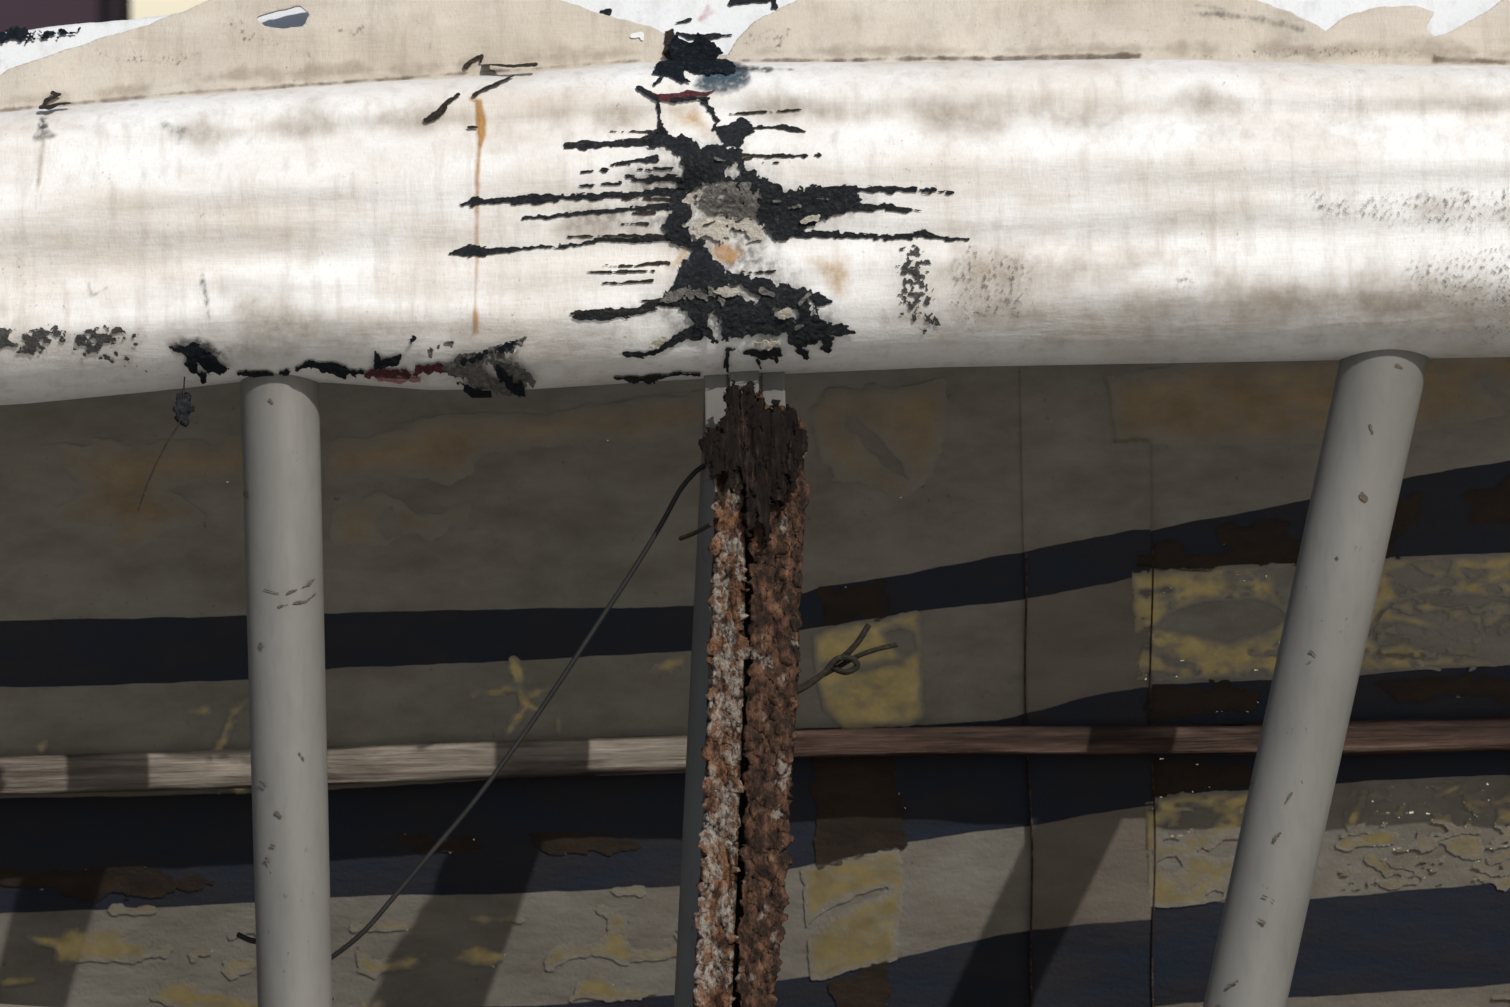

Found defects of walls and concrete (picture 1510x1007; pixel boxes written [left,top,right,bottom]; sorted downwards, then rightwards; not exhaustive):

peeling [0,26,81,44]
peeling [636,18,736,103]
peeling [728,0,778,9]
corrosion [474,100,485,213]
peeling [237,369,290,378]
peeling [1132,518,1301,724]
peeling [1360,492,1510,704]
peeling [1144,758,1253,908]
peeling [1335,779,1510,892]
peeling [26,903,258,1007]